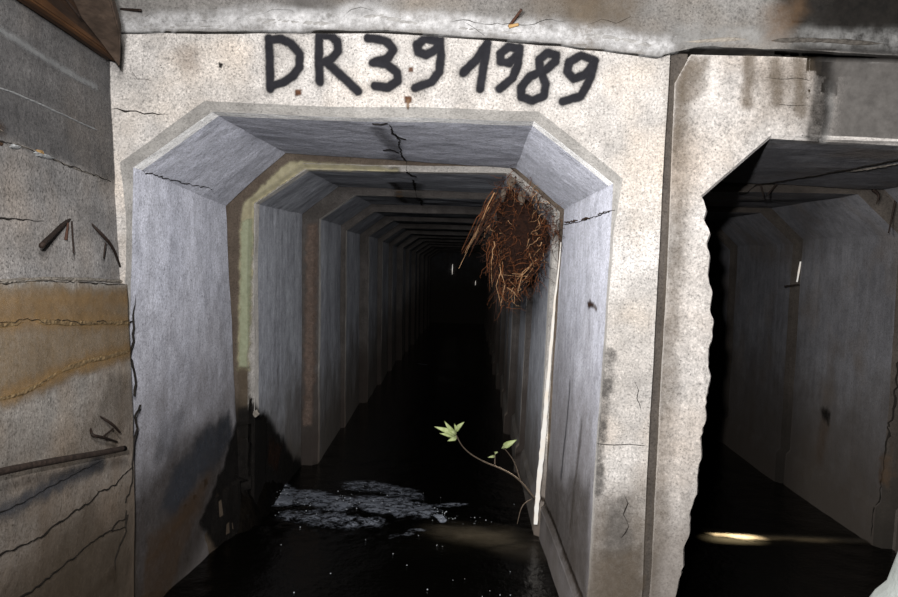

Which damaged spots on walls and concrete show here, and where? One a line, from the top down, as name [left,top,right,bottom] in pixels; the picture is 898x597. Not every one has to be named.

crack [0,87,99,131]
crack [114,107,168,115]
crack [372,123,423,205]
crack [0,277,142,597]
crack [871,362,898,534]